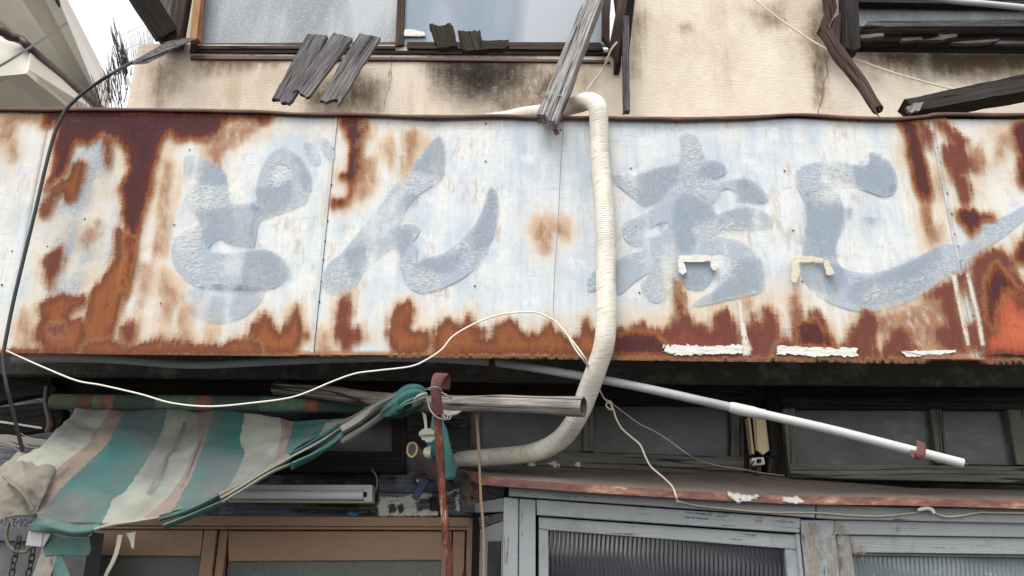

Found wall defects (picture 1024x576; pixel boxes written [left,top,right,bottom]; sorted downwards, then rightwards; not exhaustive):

damp [434,56,553,107]
corrosion [329,116,374,209]
corrosion [897,118,1024,240]
corrosion [0,111,362,356]
corrosion [384,298,595,360]
corrosion [611,233,1024,364]
peeling [728,492,759,502]
peeling [782,496,804,504]